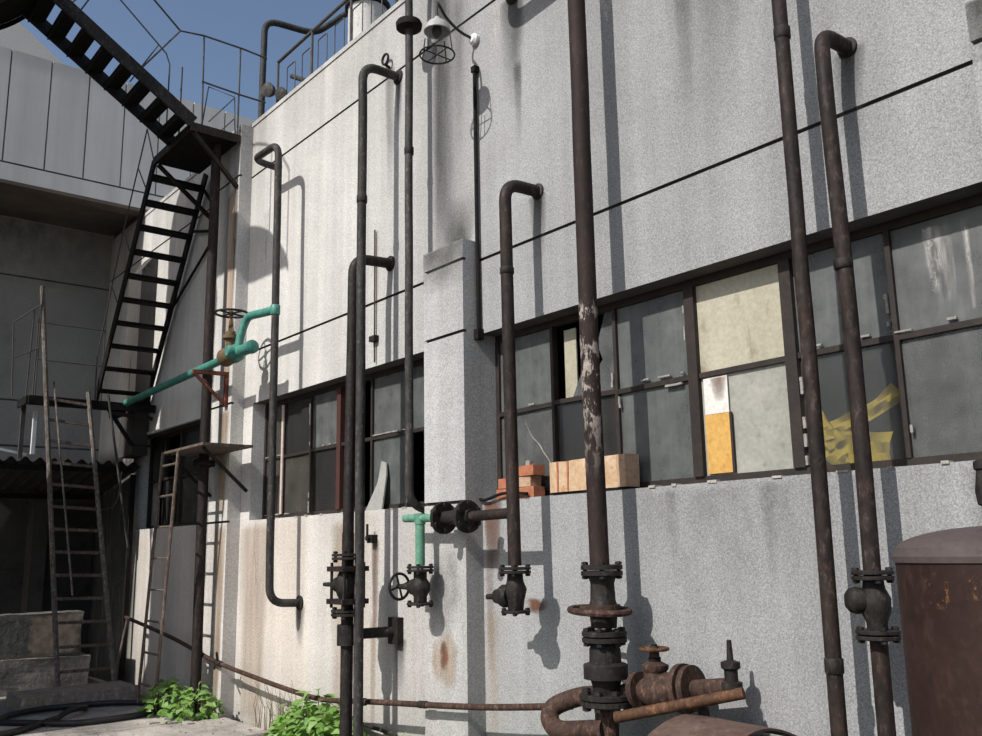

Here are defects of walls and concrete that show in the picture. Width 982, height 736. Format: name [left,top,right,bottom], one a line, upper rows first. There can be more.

damp [437,38,448,172]
rust [530,599,543,611]
rust [435,643,452,673]